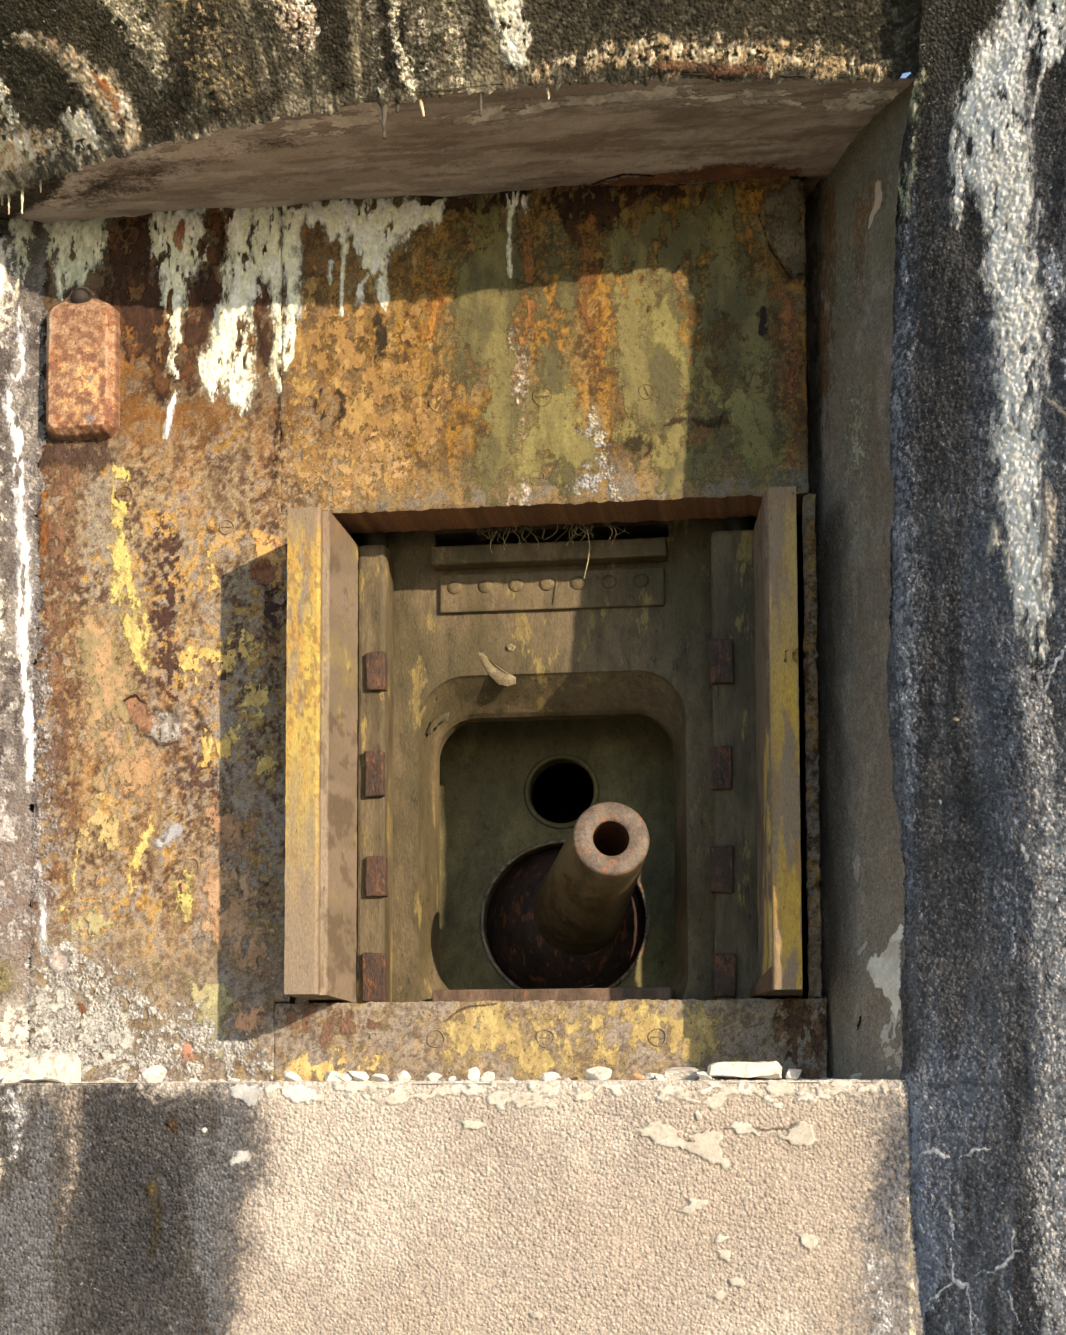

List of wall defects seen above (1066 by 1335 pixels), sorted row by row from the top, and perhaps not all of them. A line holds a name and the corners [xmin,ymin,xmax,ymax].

damp [0,0,282,844]
corrosion [99,213,227,403]
corrosion [253,279,282,479]
damp [149,196,446,439]
corrosion [31,402,116,923]
corrosion [142,507,187,704]
peeling [179,623,269,767]
peeling [251,528,287,591]
damp [948,0,1066,1335]
peeling [229,923,904,1170]
damp [0,1082,270,1335]
crack [921,1147,1021,1335]